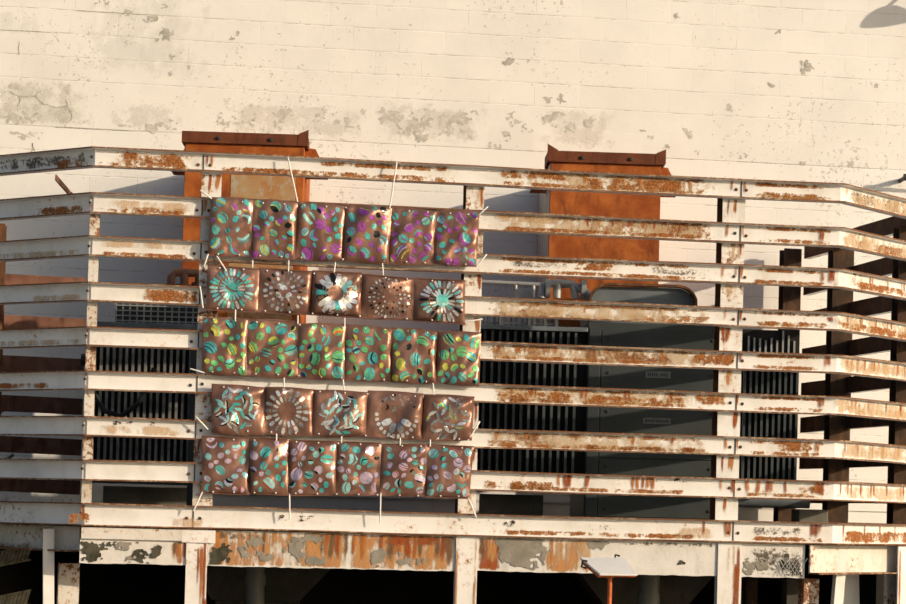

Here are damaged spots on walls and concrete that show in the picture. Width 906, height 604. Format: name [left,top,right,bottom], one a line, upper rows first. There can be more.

crack [9,88,123,131]
corrosion [501,171,707,194]
corrosion [744,182,828,200]
corrosion [489,310,742,384]
corrosion [496,387,725,407]
corrosion [488,432,708,453]
corrosion [720,439,824,511]
spalling [80,541,162,564]
spalling [209,534,326,565]
spalling [495,538,552,570]
spalling [588,540,610,550]
spalling [743,553,802,576]